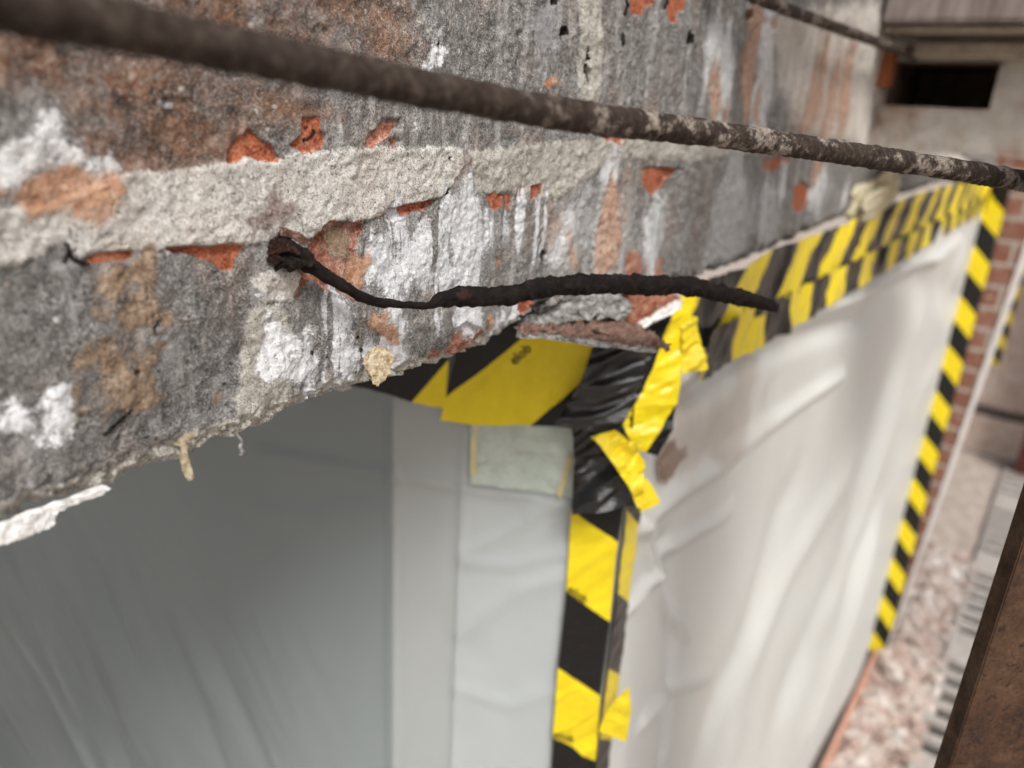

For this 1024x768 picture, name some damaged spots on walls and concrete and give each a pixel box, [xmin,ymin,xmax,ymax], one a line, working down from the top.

spalling [0,0,1024,192]
corrosion [708,4,777,126]
corrosion [17,164,126,228]
corrosion [249,191,295,237]
corrosion [594,164,629,274]
crack [62,243,90,266]
spalling [166,243,245,271]
corrosion [319,225,372,290]
water stain [253,138,671,403]
spalling [266,219,780,315]
spalling [363,345,394,387]
flaking render [0,484,111,546]